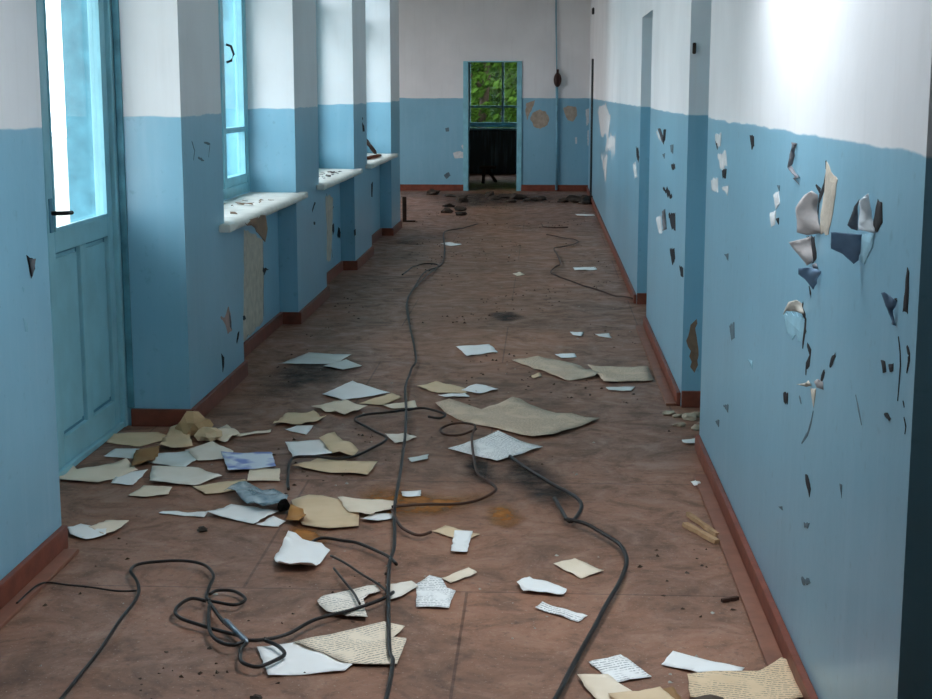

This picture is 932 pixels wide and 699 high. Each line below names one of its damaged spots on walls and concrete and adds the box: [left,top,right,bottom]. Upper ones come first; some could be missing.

flaking render [525,100,549,129]
peeling [787,142,800,184]
peeling [770,185,780,227]
peeling [789,161,883,289]
peeling [26,255,36,278]
peeling [221,215,269,342]
flaking render [686,319,699,373]
peeling [783,300,804,341]
peeling [881,267,909,326]
peeling [797,354,836,408]